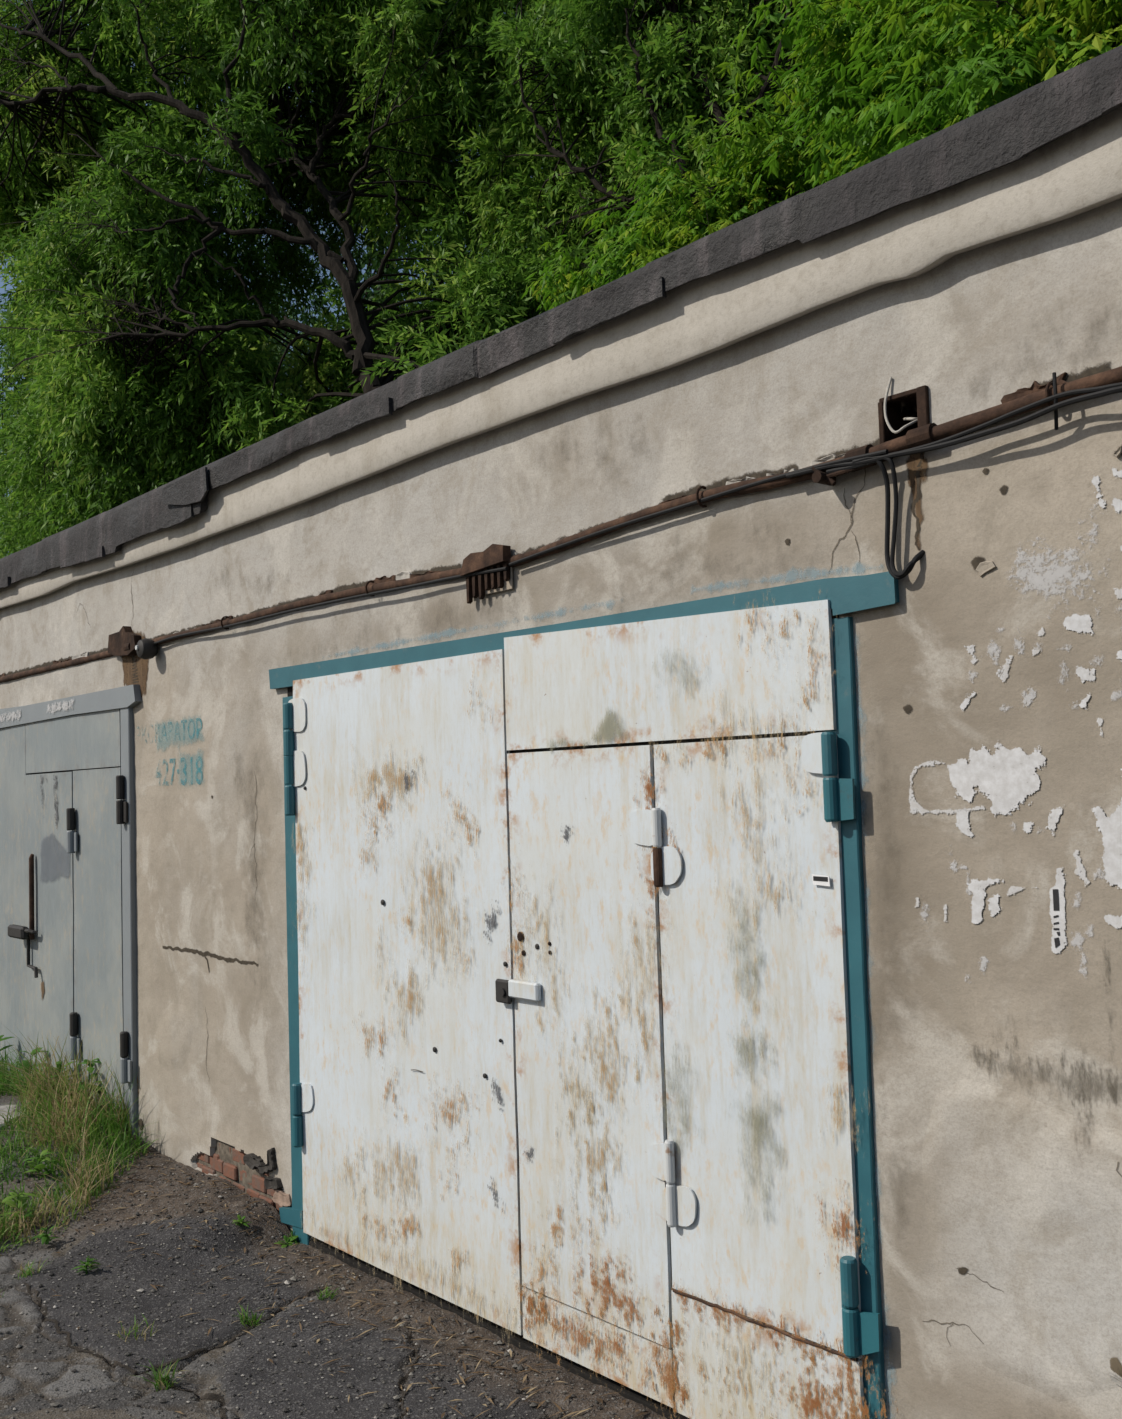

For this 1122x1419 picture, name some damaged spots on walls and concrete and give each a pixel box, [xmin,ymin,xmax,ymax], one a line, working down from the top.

crack [828,468,866,574]
rust [906,452,928,549]
flaking render [971,556,997,577]
rust [121,631,149,697]
rust [633,716,816,995]
peeling [955,808,974,838]
peeling [977,878,1004,917]
crack [163,946,258,970]
leakage [1068,1074,1117,1099]
rust [343,828,898,1419]
flaking render [196,1139,292,1214]
flaking render [1108,1357,1122,1387]